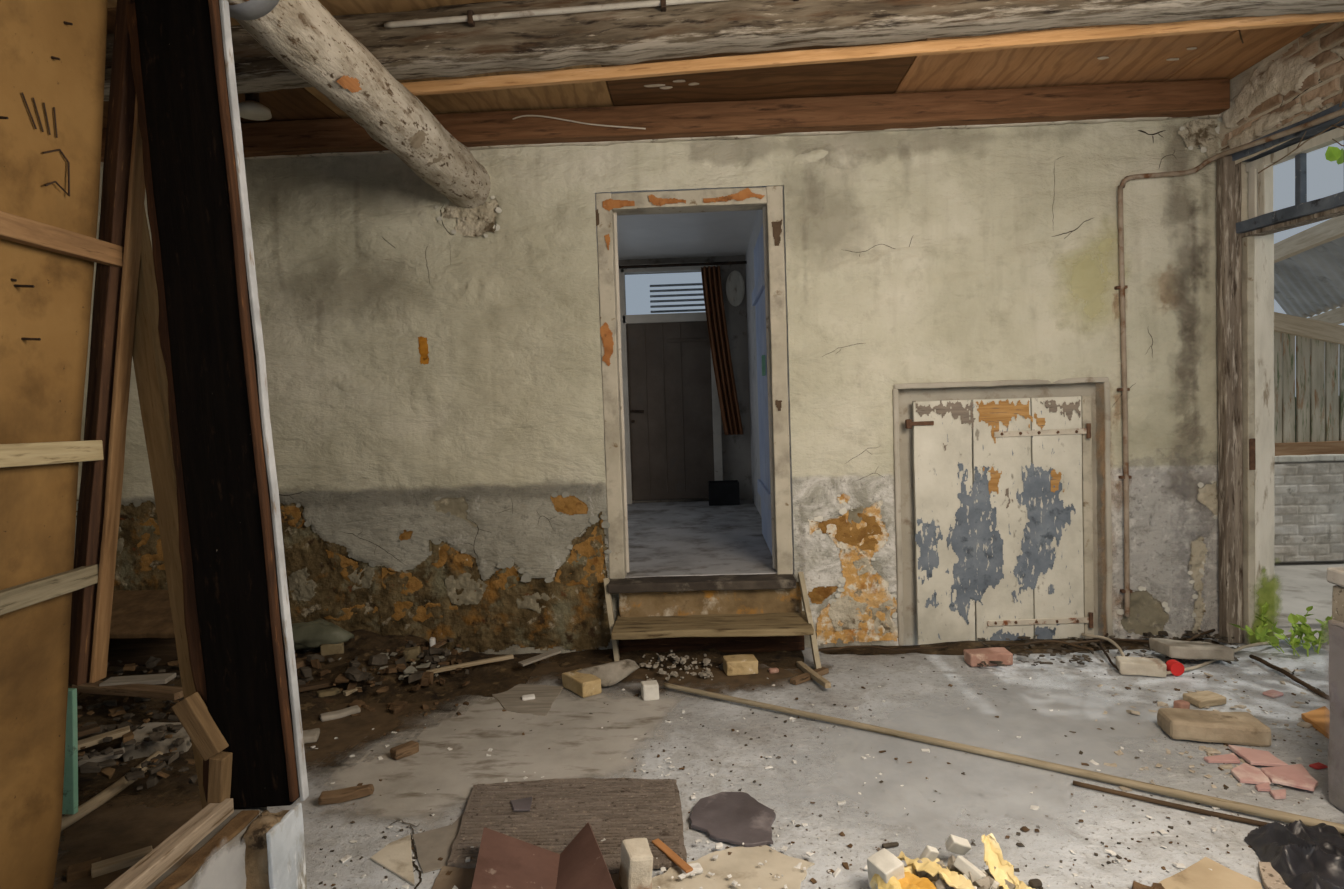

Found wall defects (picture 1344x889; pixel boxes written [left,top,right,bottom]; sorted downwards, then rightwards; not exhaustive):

flaking render [1177,21,1344,158]
peeling [595,194,686,250]
peeling [703,187,765,203]
peeling [600,322,614,366]
peeling [914,399,1081,443]
flaking render [114,499,168,591]
flaking render [280,491,612,652]
flaking render [808,493,898,645]
peeling [915,462,1076,624]
peeling [990,624,1059,641]
crack [389,818,422,889]